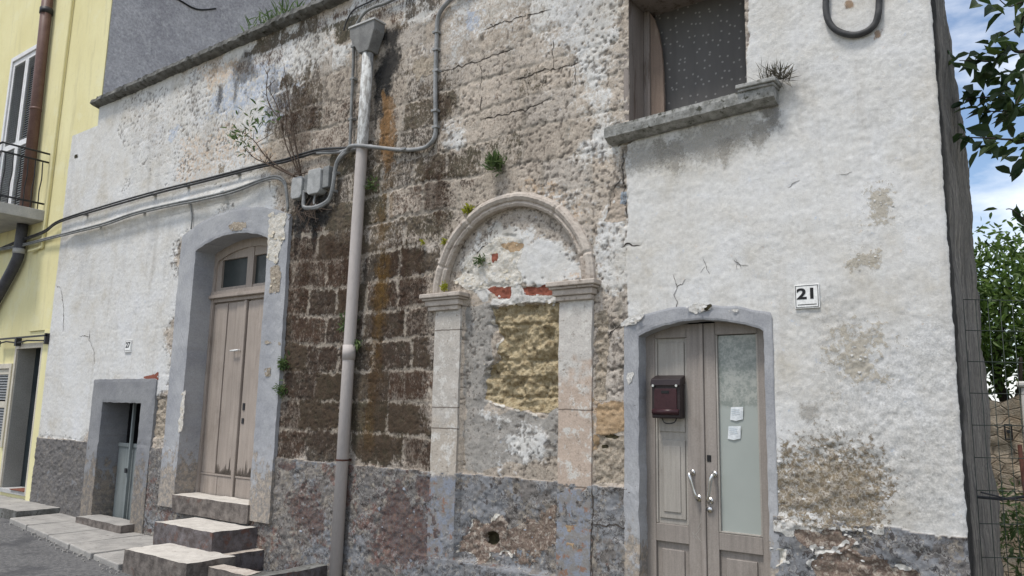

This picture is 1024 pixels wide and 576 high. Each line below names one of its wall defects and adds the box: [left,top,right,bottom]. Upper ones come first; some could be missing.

crack [484,9,550,30]
crack [441,48,549,119]
crack [512,41,581,82]
flaking render [864,180,895,226]
peeling [266,211,287,293]
flaking render [845,249,882,273]
spalling [454,236,560,417]
spalling [770,420,920,576]
spalling [456,505,576,567]